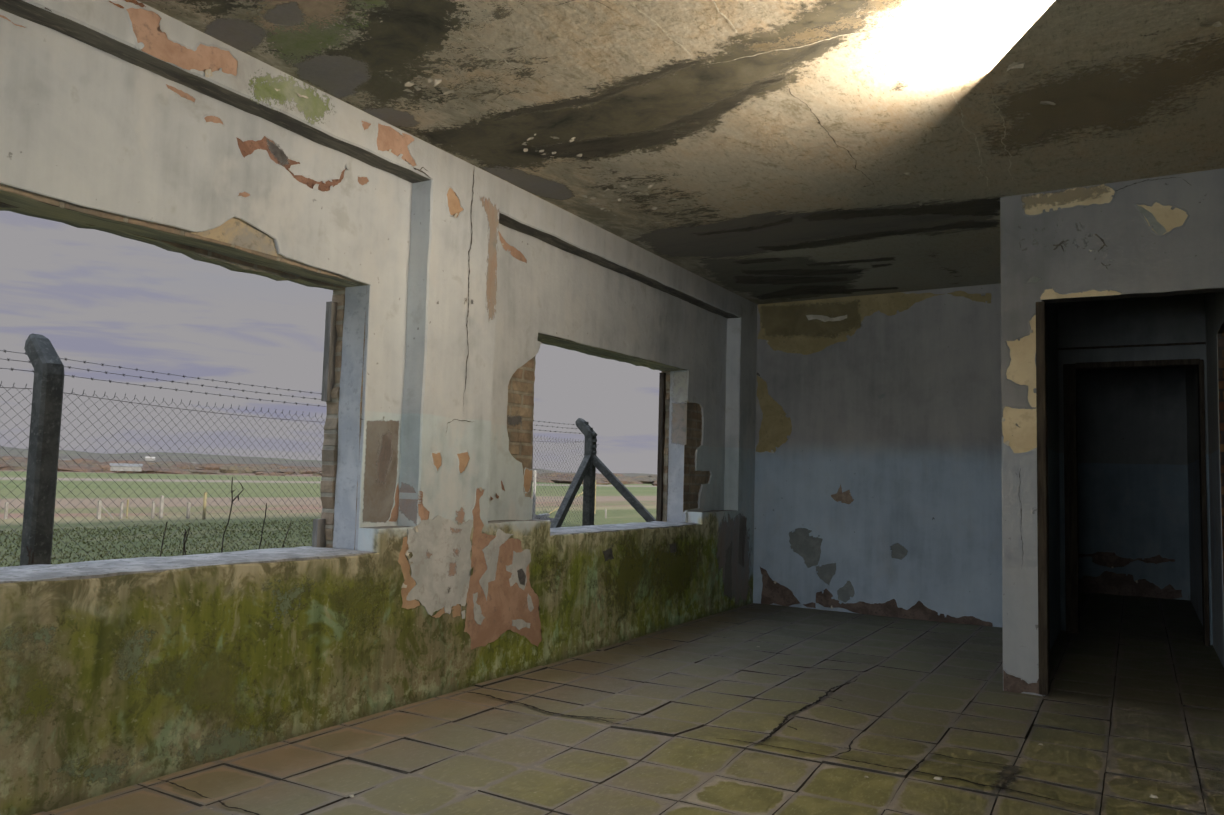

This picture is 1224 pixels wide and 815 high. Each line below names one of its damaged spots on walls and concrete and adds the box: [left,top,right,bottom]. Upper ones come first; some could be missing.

peeling [123,5,267,78]
damp [159,0,272,23]
peeling [202,114,369,194]
peeling [360,107,419,169]
damp [264,0,1004,300]
damp [984,38,1224,156]
spalling [507,356,536,499]
peeling [757,290,993,356]
peeling [1002,287,1122,455]
peeling [431,480,543,651]
peeling [759,527,994,627]
crack [720,679,1094,809]